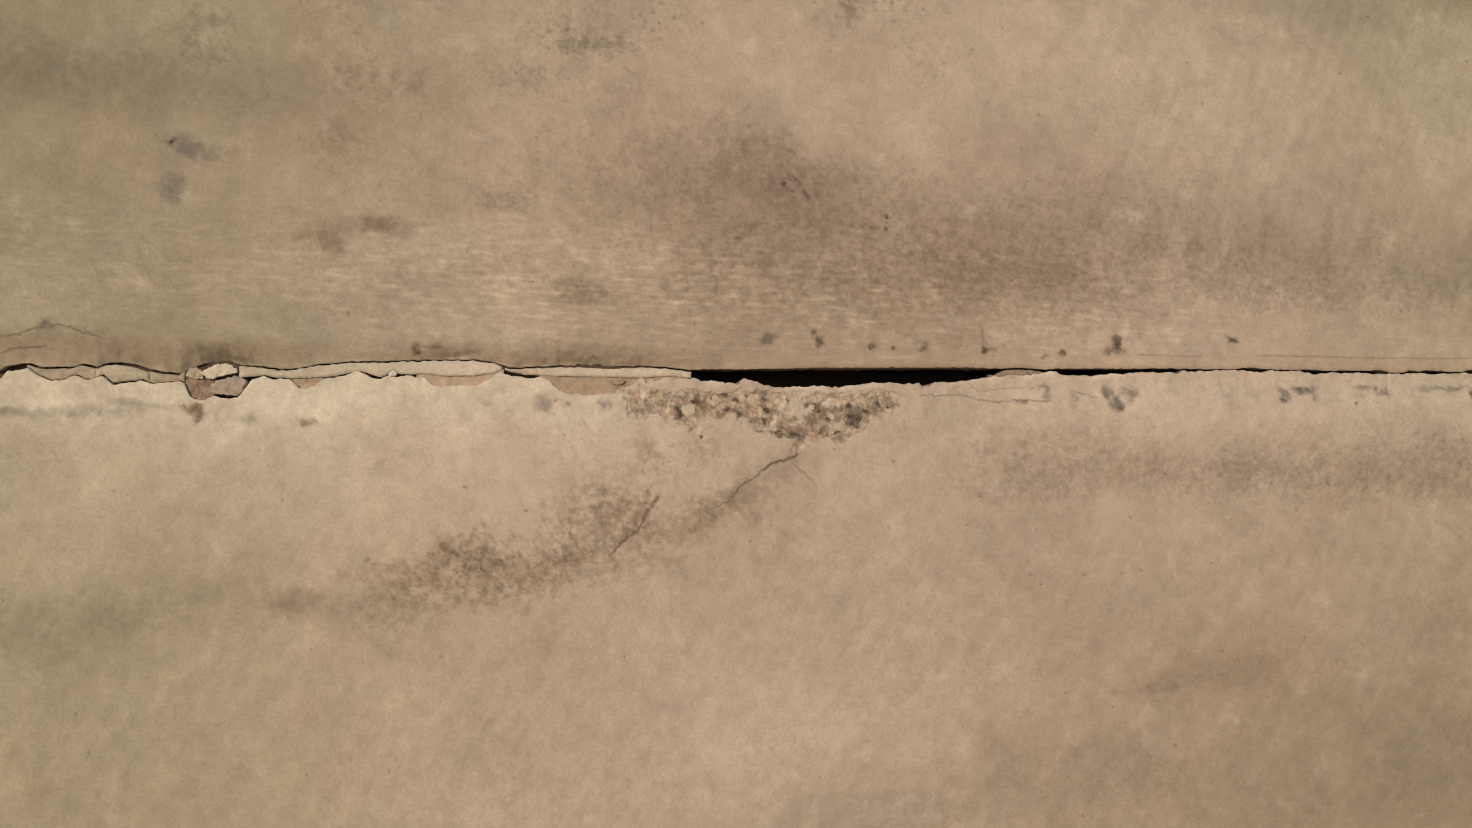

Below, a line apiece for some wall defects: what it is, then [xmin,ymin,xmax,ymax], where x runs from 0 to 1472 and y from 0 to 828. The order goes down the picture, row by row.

spalling [27,352,904,455]
crack [0,324,1214,399]